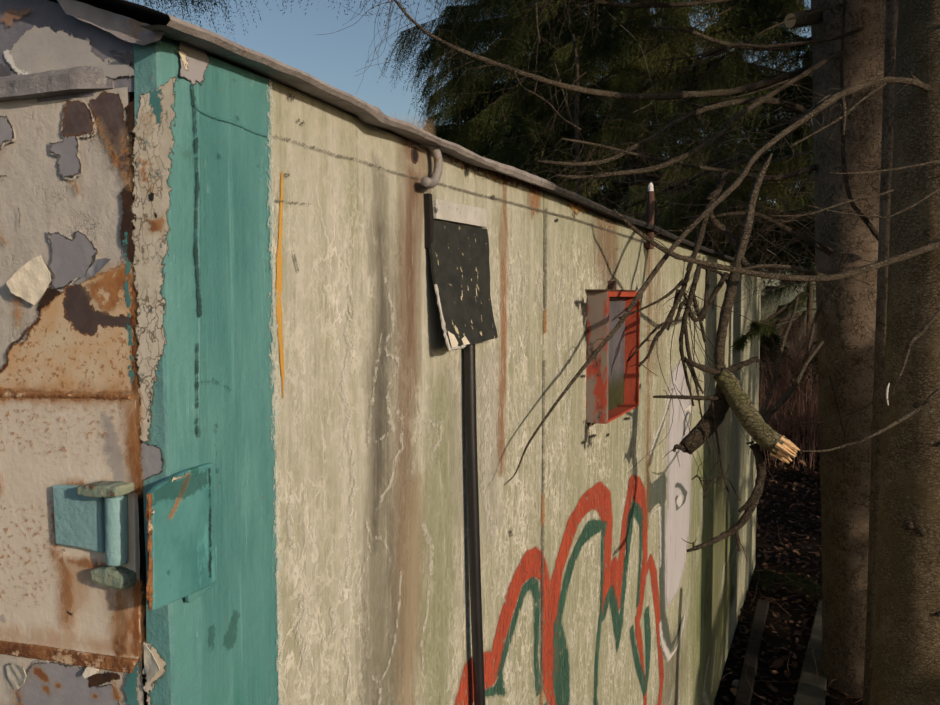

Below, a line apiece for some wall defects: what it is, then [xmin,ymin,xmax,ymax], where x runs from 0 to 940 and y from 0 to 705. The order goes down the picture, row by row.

peeling [0,25,134,79]
peeling [49,98,97,181]
peeling [6,229,111,326]
peeling [131,40,210,482]
rust [0,259,142,495]
leakage [368,294,403,502]
rust [498,250,507,474]
rust [0,506,107,623]
peeling [6,660,122,705]
rust [0,581,143,674]
peeling [141,642,167,705]
leakage [372,482,434,705]